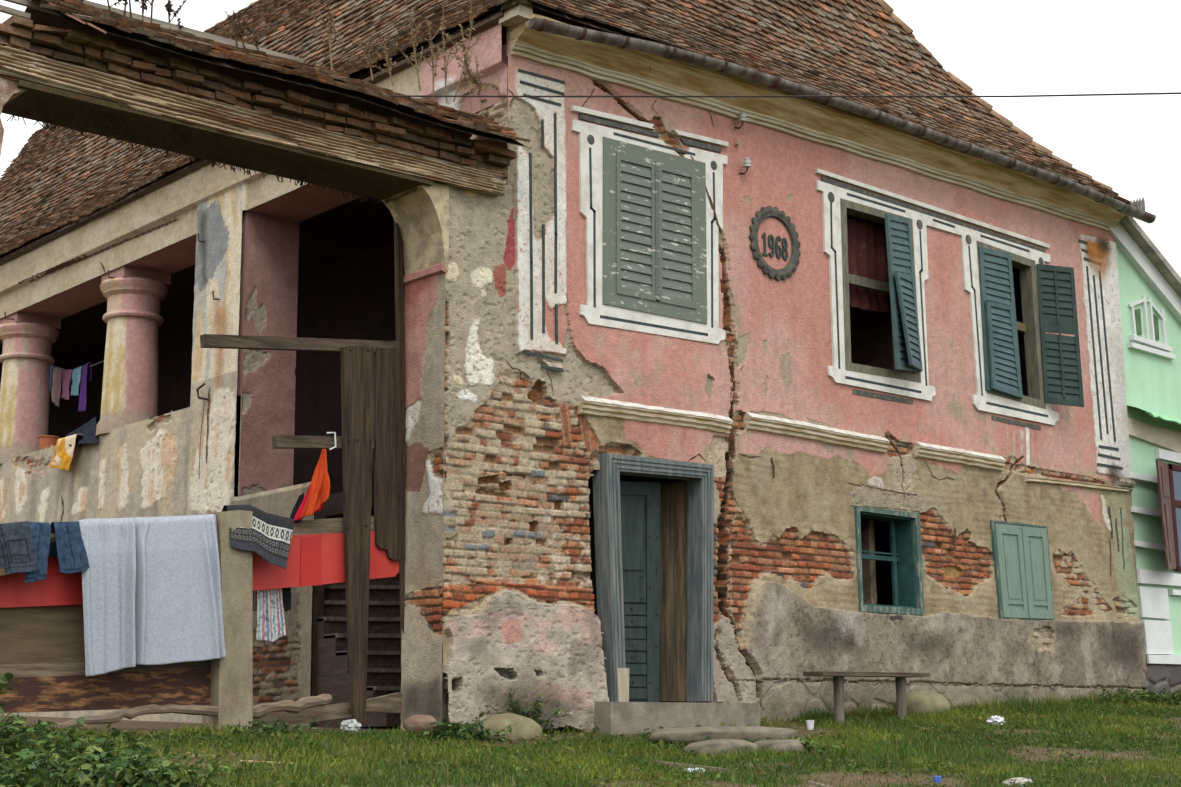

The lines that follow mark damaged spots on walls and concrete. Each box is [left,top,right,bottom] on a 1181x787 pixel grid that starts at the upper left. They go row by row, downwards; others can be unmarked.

flaking render [430,71,512,127]
crack [582,80,694,160]
flaking render [245,286,267,334]
flaking render [243,349,272,375]
flaking render [404,145,642,636]
peeling [69,414,179,520]
peeling [187,386,268,515]
crack [688,187,1131,709]
flaking render [702,374,855,703]
flaking render [919,507,994,597]
flaking render [1053,549,1138,618]
flaking render [1031,626,1055,652]